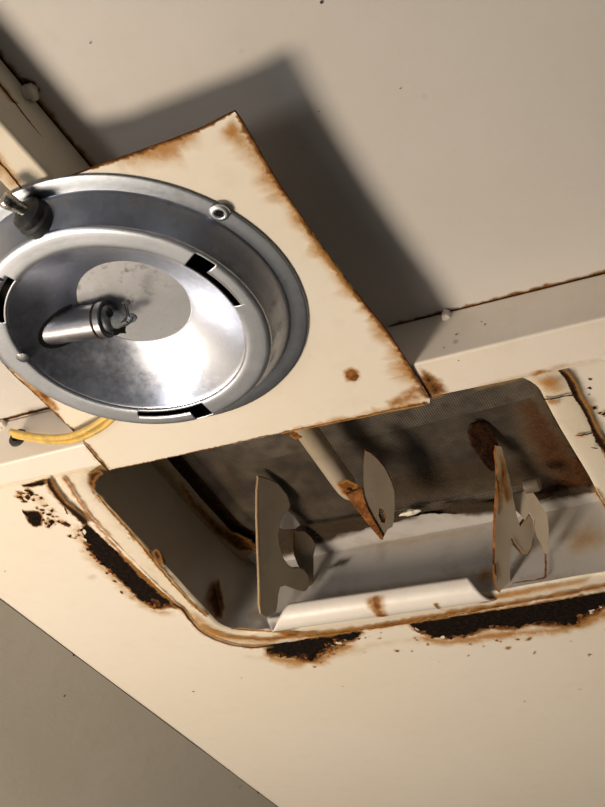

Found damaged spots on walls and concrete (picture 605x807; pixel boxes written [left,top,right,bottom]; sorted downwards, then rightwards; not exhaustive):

corrosion [0,51,605,667]